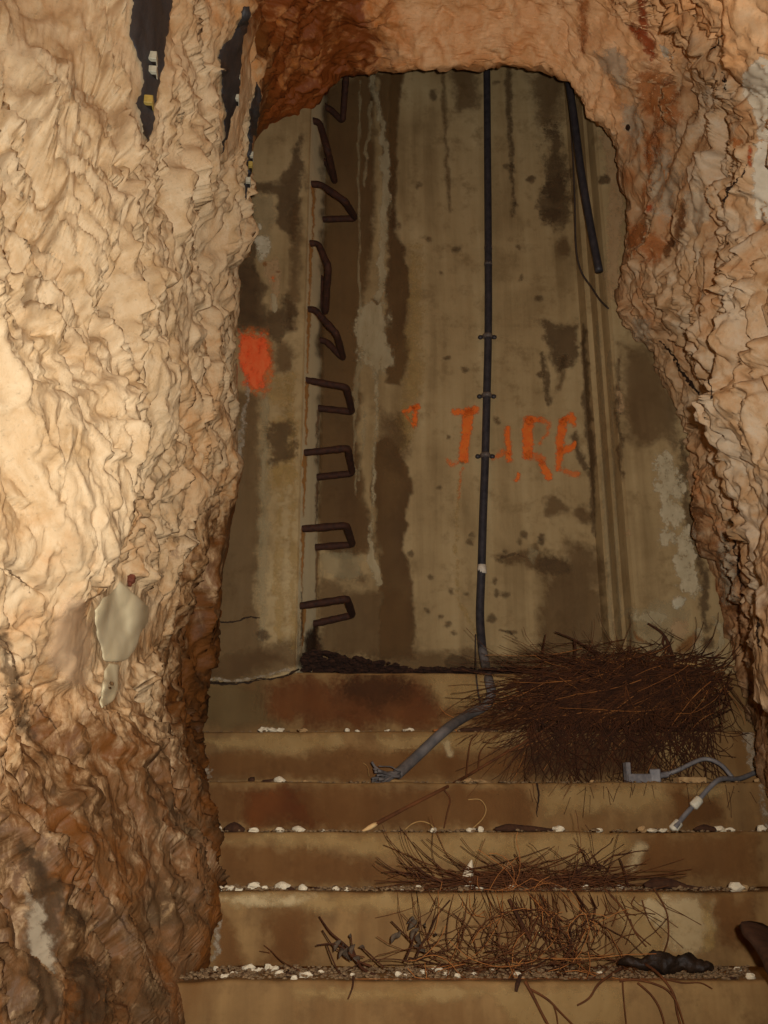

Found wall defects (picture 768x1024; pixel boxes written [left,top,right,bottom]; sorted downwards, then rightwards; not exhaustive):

corrosion [302,185,319,524]
water stain [211,68,604,680]
crack [210,668,300,685]
corrosion [270,675,443,728]